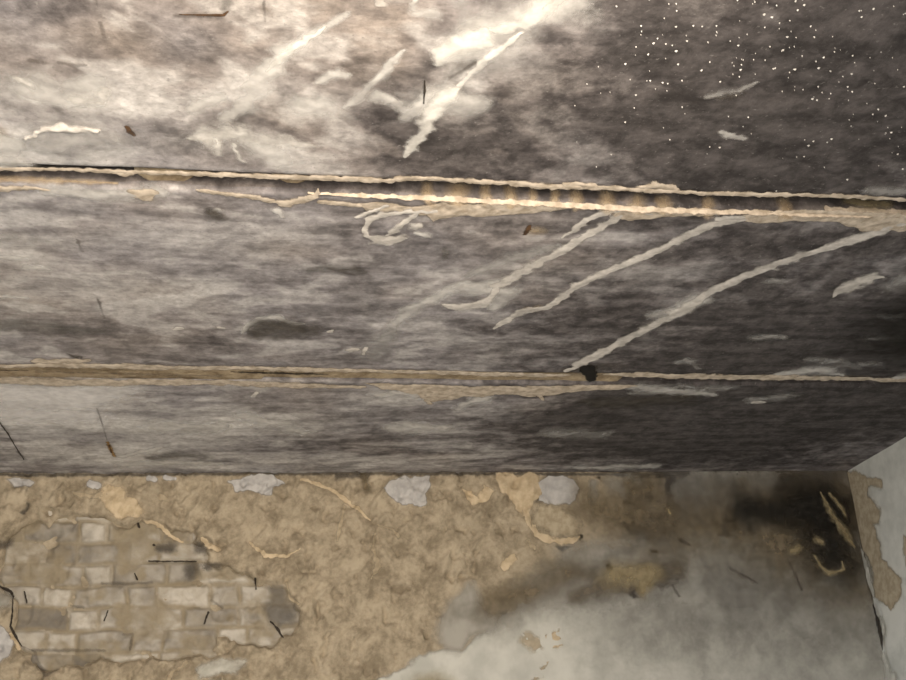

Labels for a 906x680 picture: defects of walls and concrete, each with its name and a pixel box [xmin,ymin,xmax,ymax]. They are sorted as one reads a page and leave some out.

damp [13,74,55,101]
damp [188,13,349,162]
damp [343,0,584,158]
damp [0,157,906,423]
peeling [8,478,34,487]
spalling [0,480,301,680]
damp [0,447,496,492]
peeling [228,474,285,495]
peeling [300,478,400,579]
damp [385,422,449,431]
peeling [378,471,902,680]
damp [484,464,868,634]